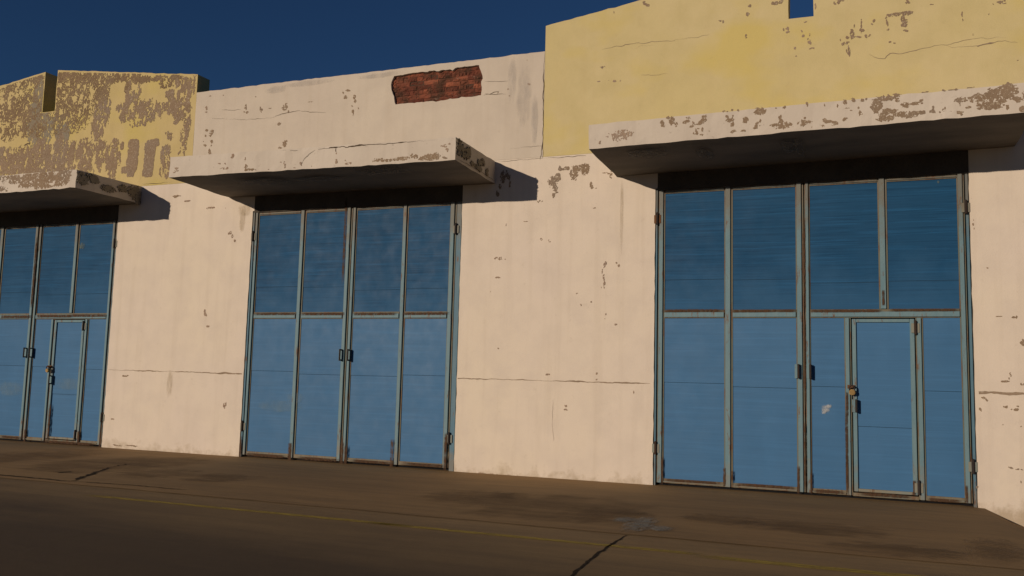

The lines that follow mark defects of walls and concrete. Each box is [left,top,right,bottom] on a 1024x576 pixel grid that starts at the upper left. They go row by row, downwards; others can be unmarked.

peeling [840,0,913,57]
crack [875,37,1009,59]
flaking render [392,66,483,104]
peeling [0,72,197,205]
crack [290,141,414,159]
peeling [373,138,511,197]
peeling [537,163,596,203]
peeling [660,115,710,136]
peeling [722,82,1024,133]
crack [570,535,627,576]